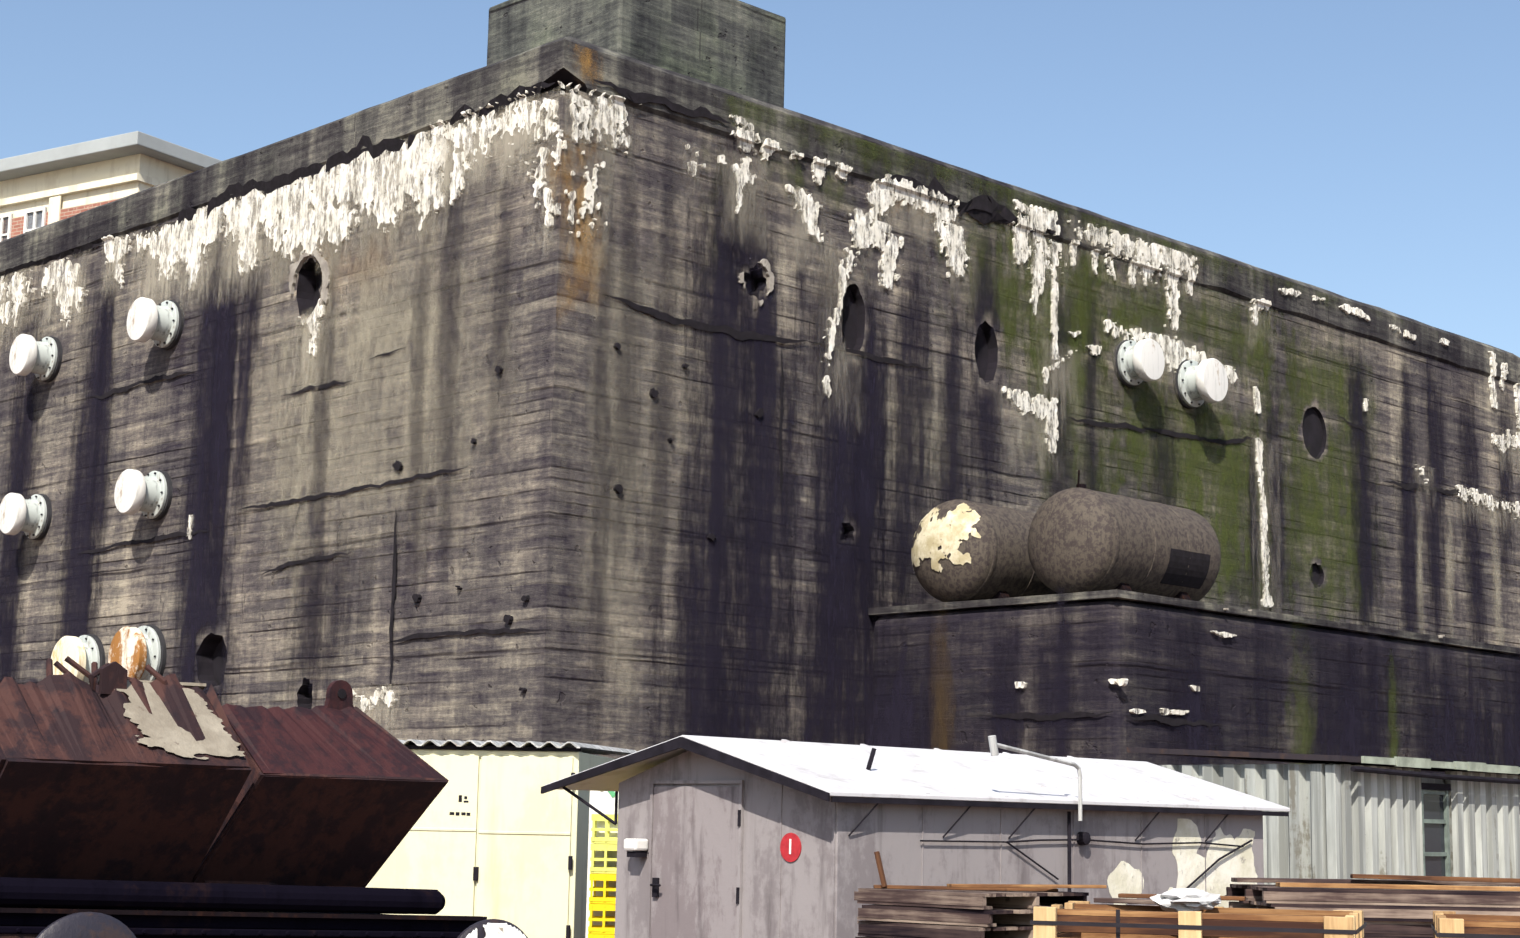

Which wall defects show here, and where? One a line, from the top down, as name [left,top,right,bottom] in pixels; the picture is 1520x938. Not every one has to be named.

crack [0,81,555,280]
rust [576,190,596,272]
crack [593,79,731,124]
damp [7,372,37,500]
damp [55,287,113,644]
damp [175,247,259,701]
crack [603,294,933,512]
damp [660,161,1378,765]
damp [1400,360,1500,642]
damp [1499,417,1512,552]
damp [0,531,25,681]
damp [1298,646,1520,774]